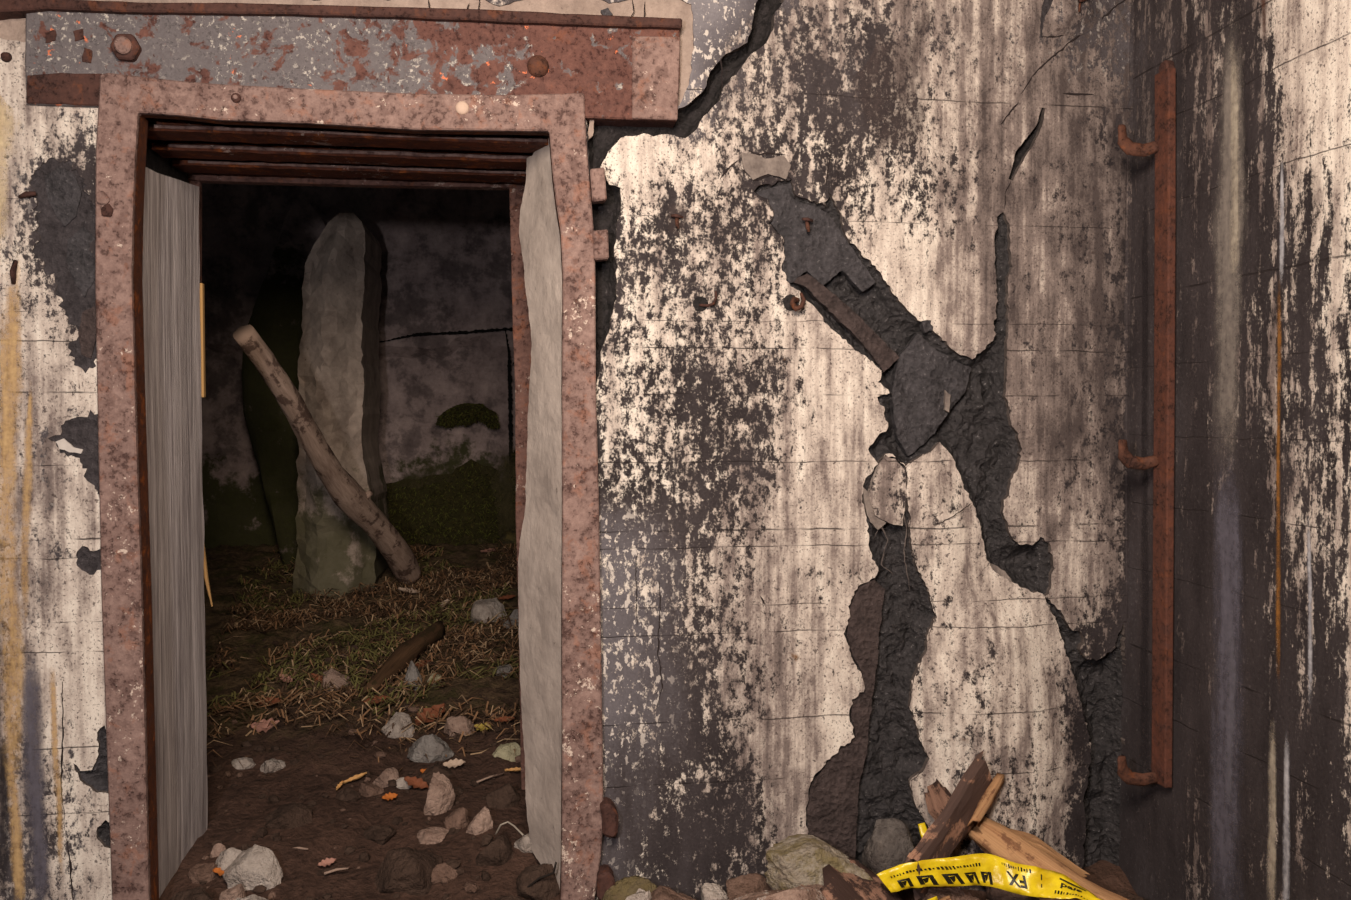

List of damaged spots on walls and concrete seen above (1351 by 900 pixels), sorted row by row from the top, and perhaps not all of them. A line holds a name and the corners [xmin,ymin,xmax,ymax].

corrosion [45,30,57,43]
corrosion [73,29,93,63]
peeling [29,158,97,373]
crack [587,0,784,383]
leakage [1217,46,1246,425]
peeling [48,410,99,494]
peeling [76,546,101,575]
spalling [73,725,108,793]
spalling [97,820,110,848]
crack [635,550,663,709]
leakage [1211,485,1241,899]
efflorescence [1269,741,1289,900]